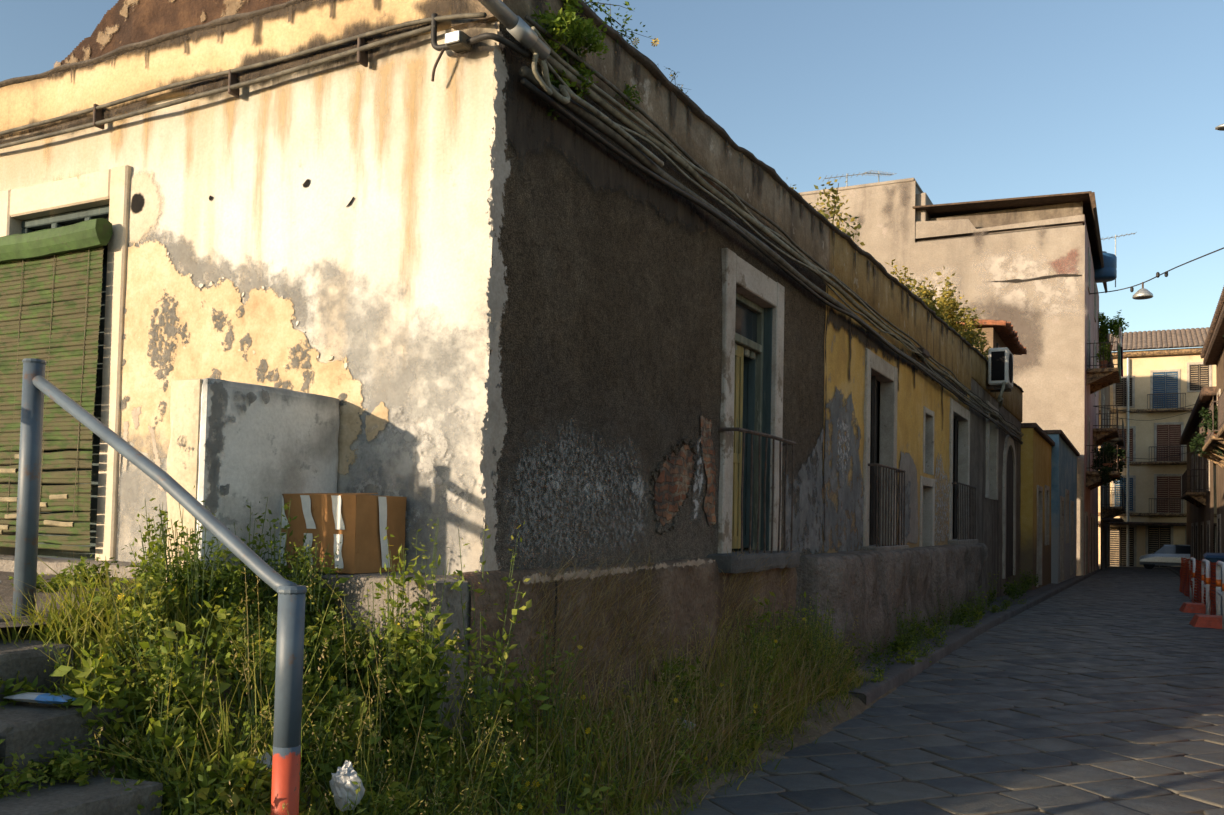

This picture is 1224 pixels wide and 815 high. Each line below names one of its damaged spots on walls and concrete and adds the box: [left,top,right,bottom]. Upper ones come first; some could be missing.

flaking render [54,0,138,68]
peeling [120,172,389,515]
flaking render [649,415,716,535]